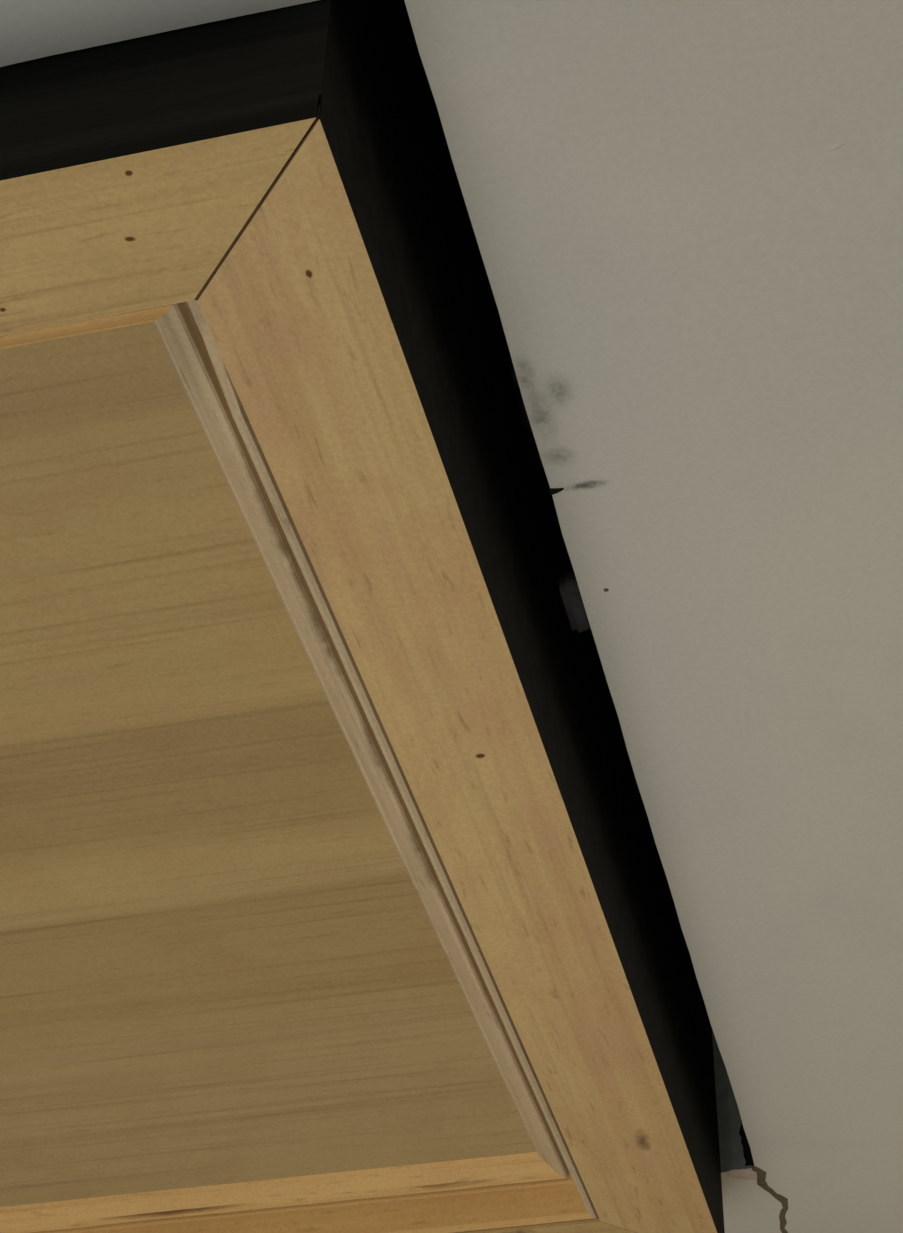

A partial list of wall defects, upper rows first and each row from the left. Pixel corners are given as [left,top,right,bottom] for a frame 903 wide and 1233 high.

crack [739,1120,788,1233]